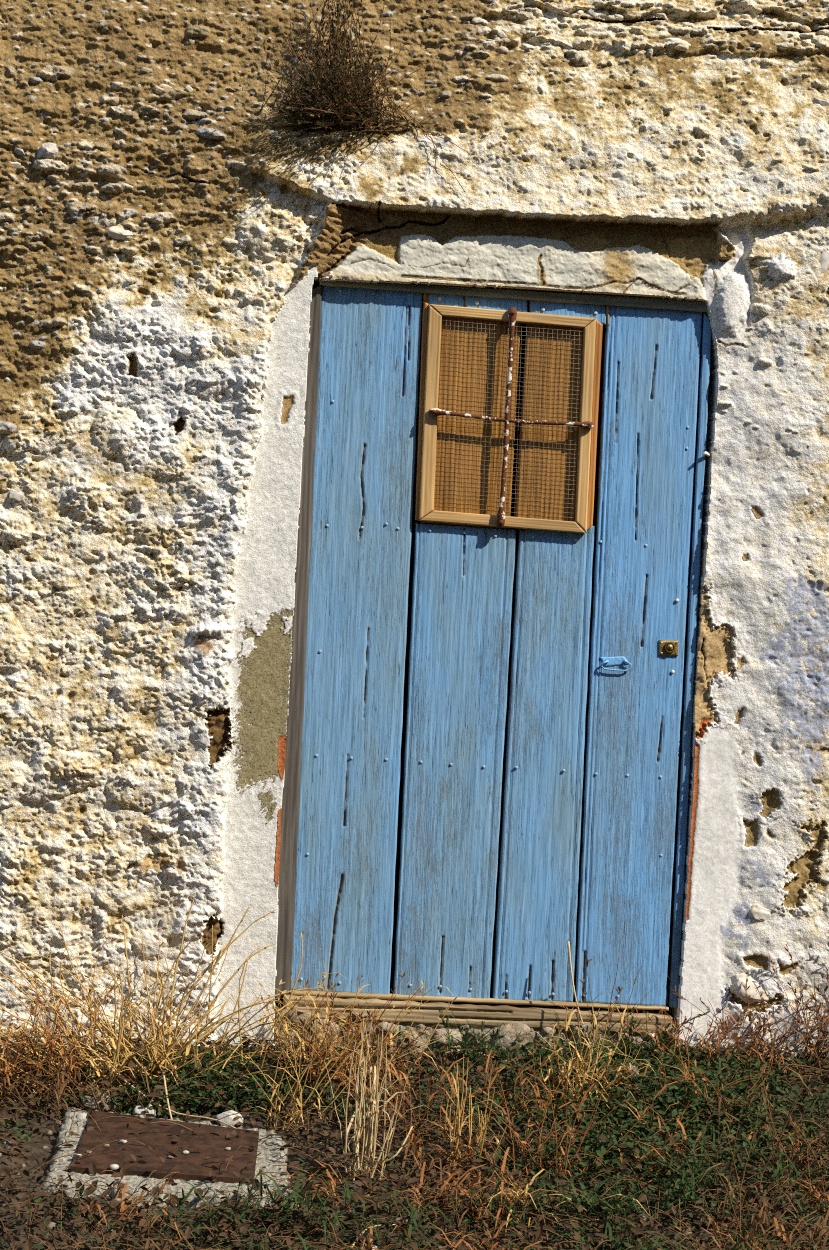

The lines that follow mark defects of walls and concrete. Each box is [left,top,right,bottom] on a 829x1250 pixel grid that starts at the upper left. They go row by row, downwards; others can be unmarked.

peeling [194,608,294,887]
spalling [686,586,747,920]
spalling [743,789,782,847]
spalling [780,822,827,908]
spalling [729,989,783,1012]
spalling [744,955,800,975]